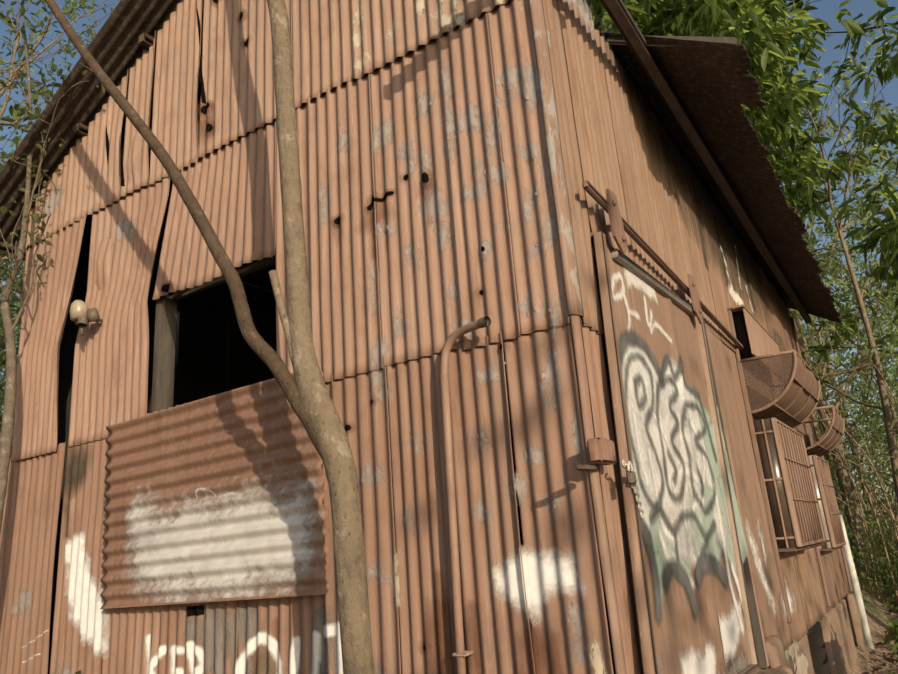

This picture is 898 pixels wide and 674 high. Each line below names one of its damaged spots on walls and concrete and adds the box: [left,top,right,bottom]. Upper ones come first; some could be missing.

peeling [352,0,373,72]
peeling [415,0,465,36]
damp [62,449,86,534]